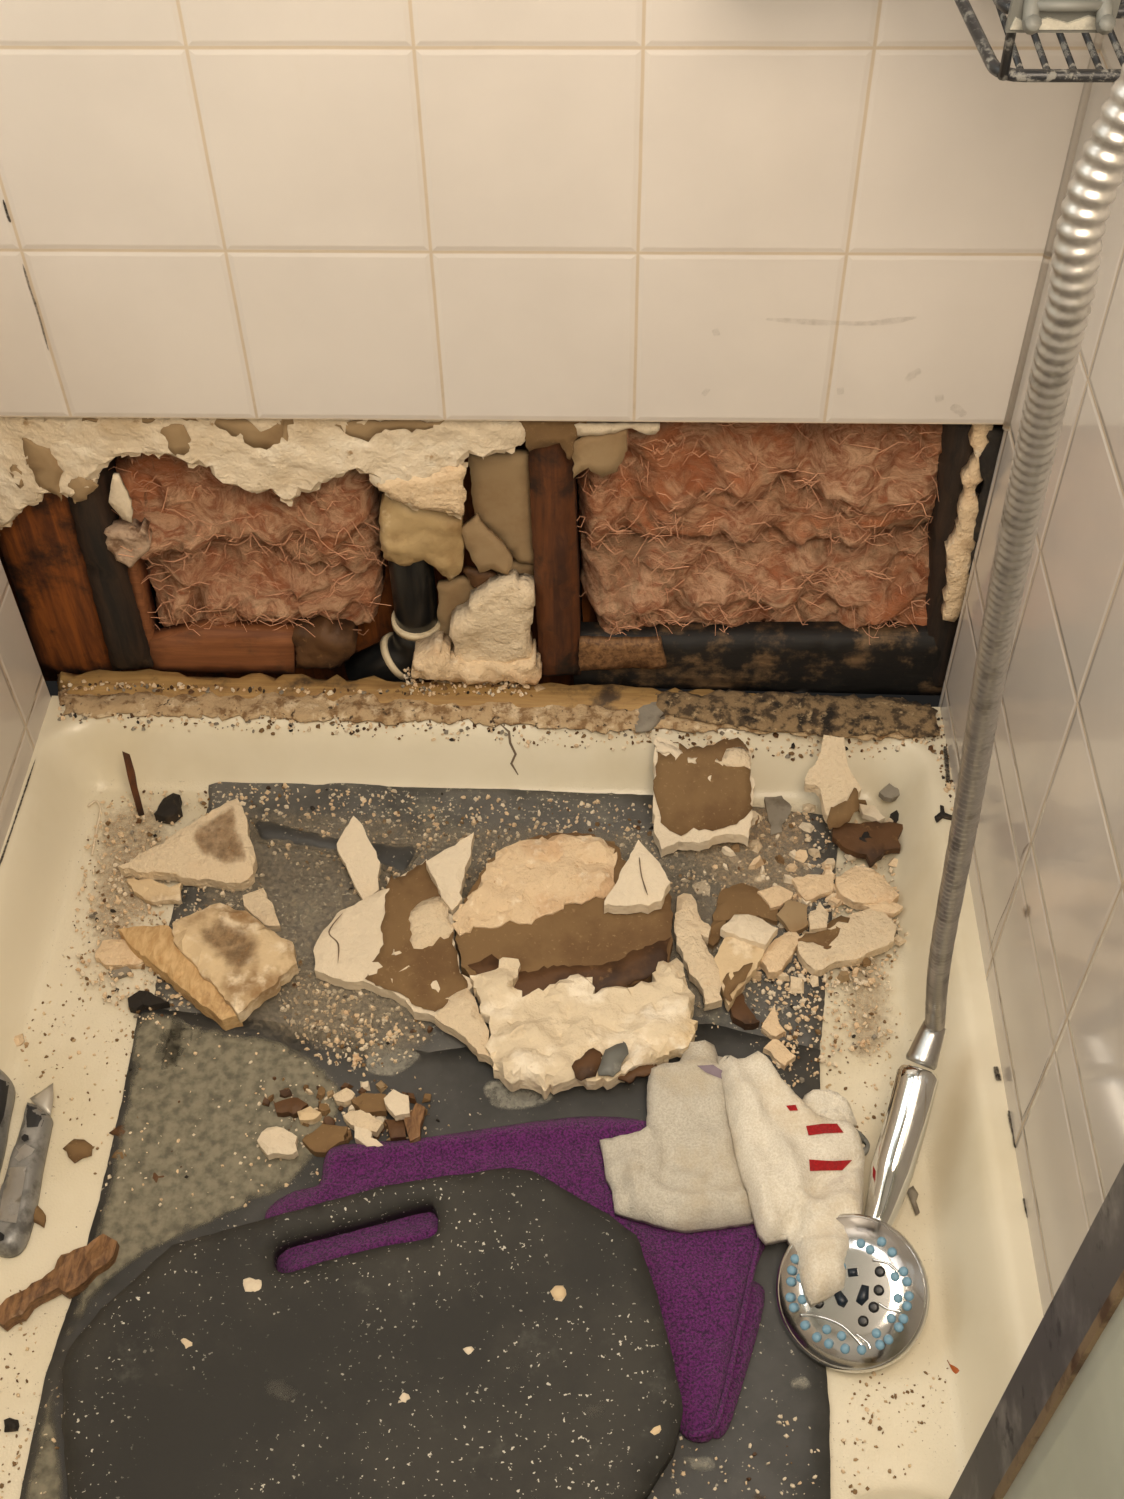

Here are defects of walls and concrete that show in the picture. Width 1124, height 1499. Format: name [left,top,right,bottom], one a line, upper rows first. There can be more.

crack [3,200,11,222]
crack [23,266,48,348]
peeling [0,417,526,530]
spalling [941,424,993,622]